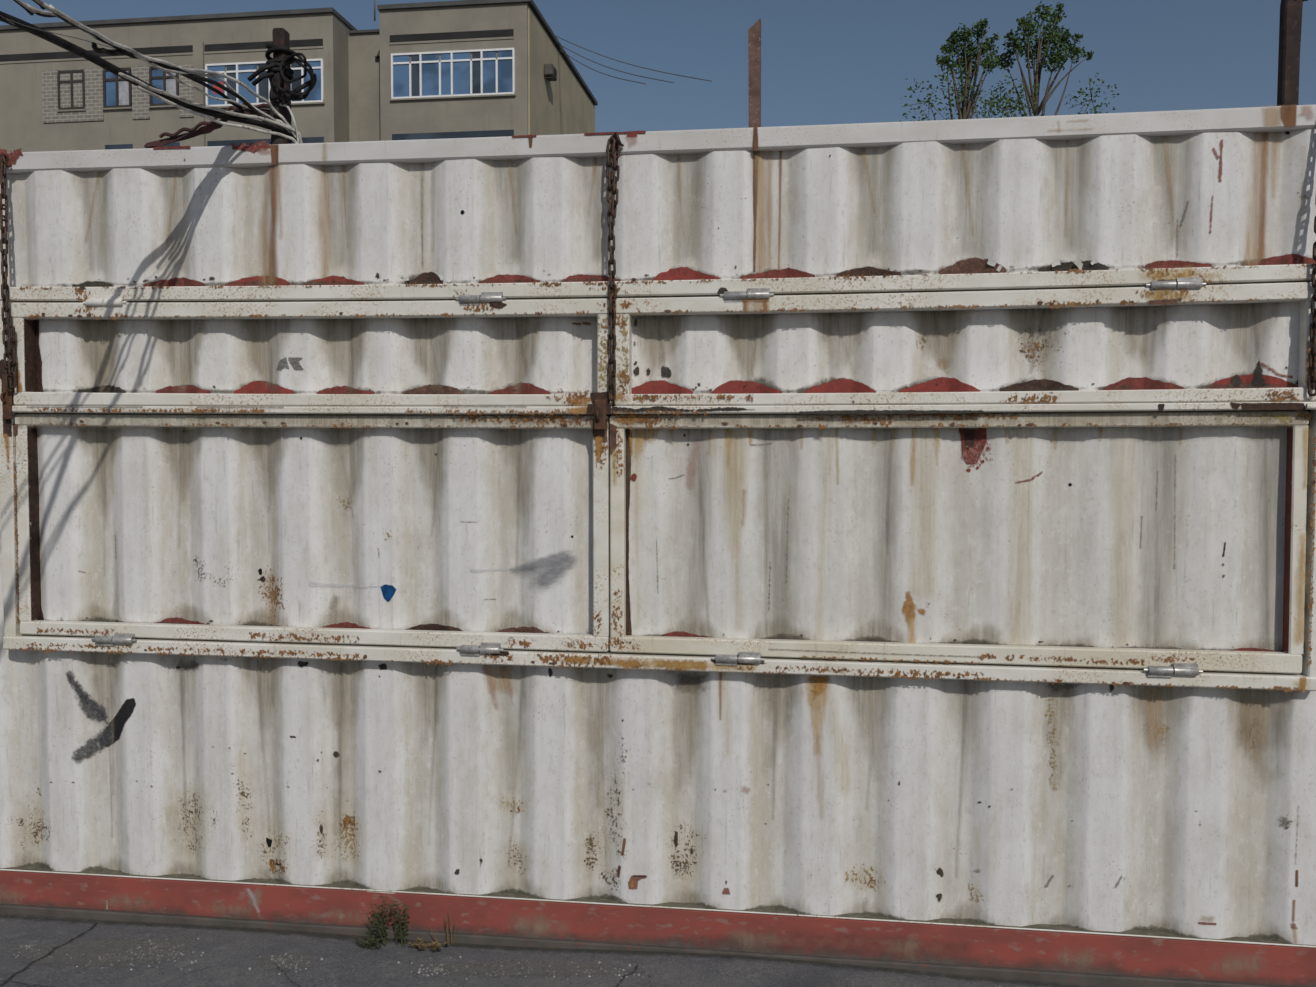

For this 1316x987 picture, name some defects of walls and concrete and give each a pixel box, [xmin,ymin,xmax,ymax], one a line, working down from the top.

corrosion [900,105,1312,310]
corrosion [20,125,1131,480]
corrosion [0,359,22,623]
peeling [959,428,993,472]
corrosion [1097,329,1316,759]
corrosion [15,566,367,661]
corrosion [421,589,1195,727]
corrosion [312,801,360,859]
corrosion [666,823,704,880]
crack [0,923,97,986]